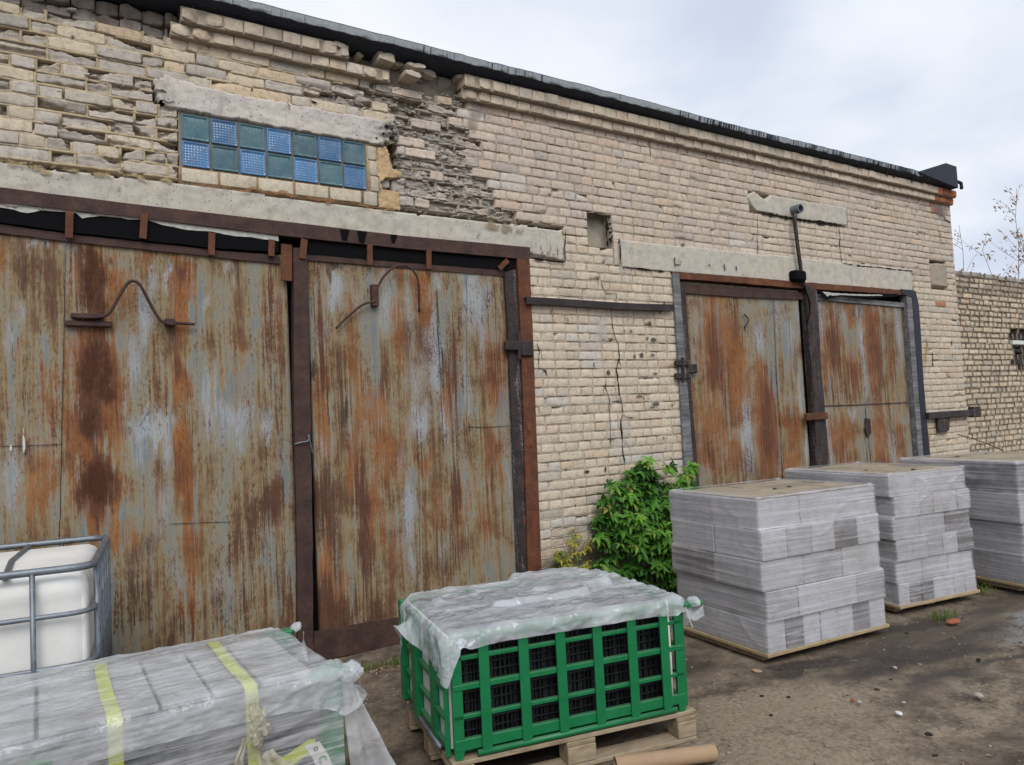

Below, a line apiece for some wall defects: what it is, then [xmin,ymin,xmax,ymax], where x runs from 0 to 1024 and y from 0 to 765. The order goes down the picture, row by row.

spalling [265,79,523,237]
crack [601,282,633,462]